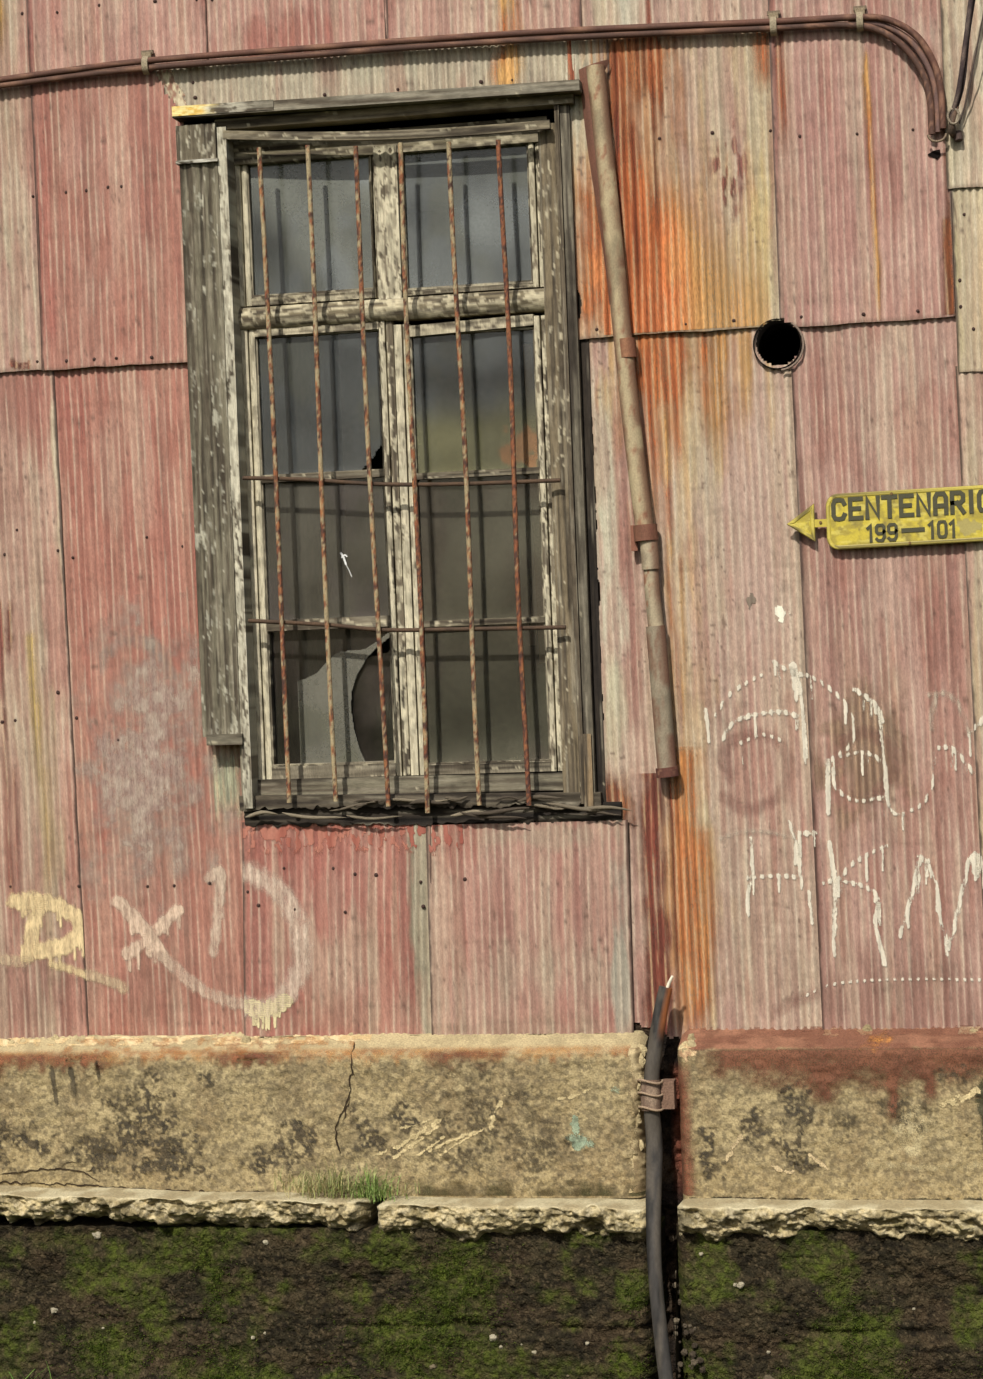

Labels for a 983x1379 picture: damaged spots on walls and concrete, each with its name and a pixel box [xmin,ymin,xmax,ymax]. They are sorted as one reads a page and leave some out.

rust [755,31,786,126]
rust [581,0,756,518]
rust [606,749,714,1036]
rust [0,1053,112,1071]
damp [0,1066,215,1180]
rust [174,1051,280,1065]
damp [240,1119,317,1175]
crack [335,1042,356,1152]
damp [698,1127,726,1180]
damp [741,1083,855,1174]
damp [694,1025,983,1149]
damp [878,1096,943,1168]